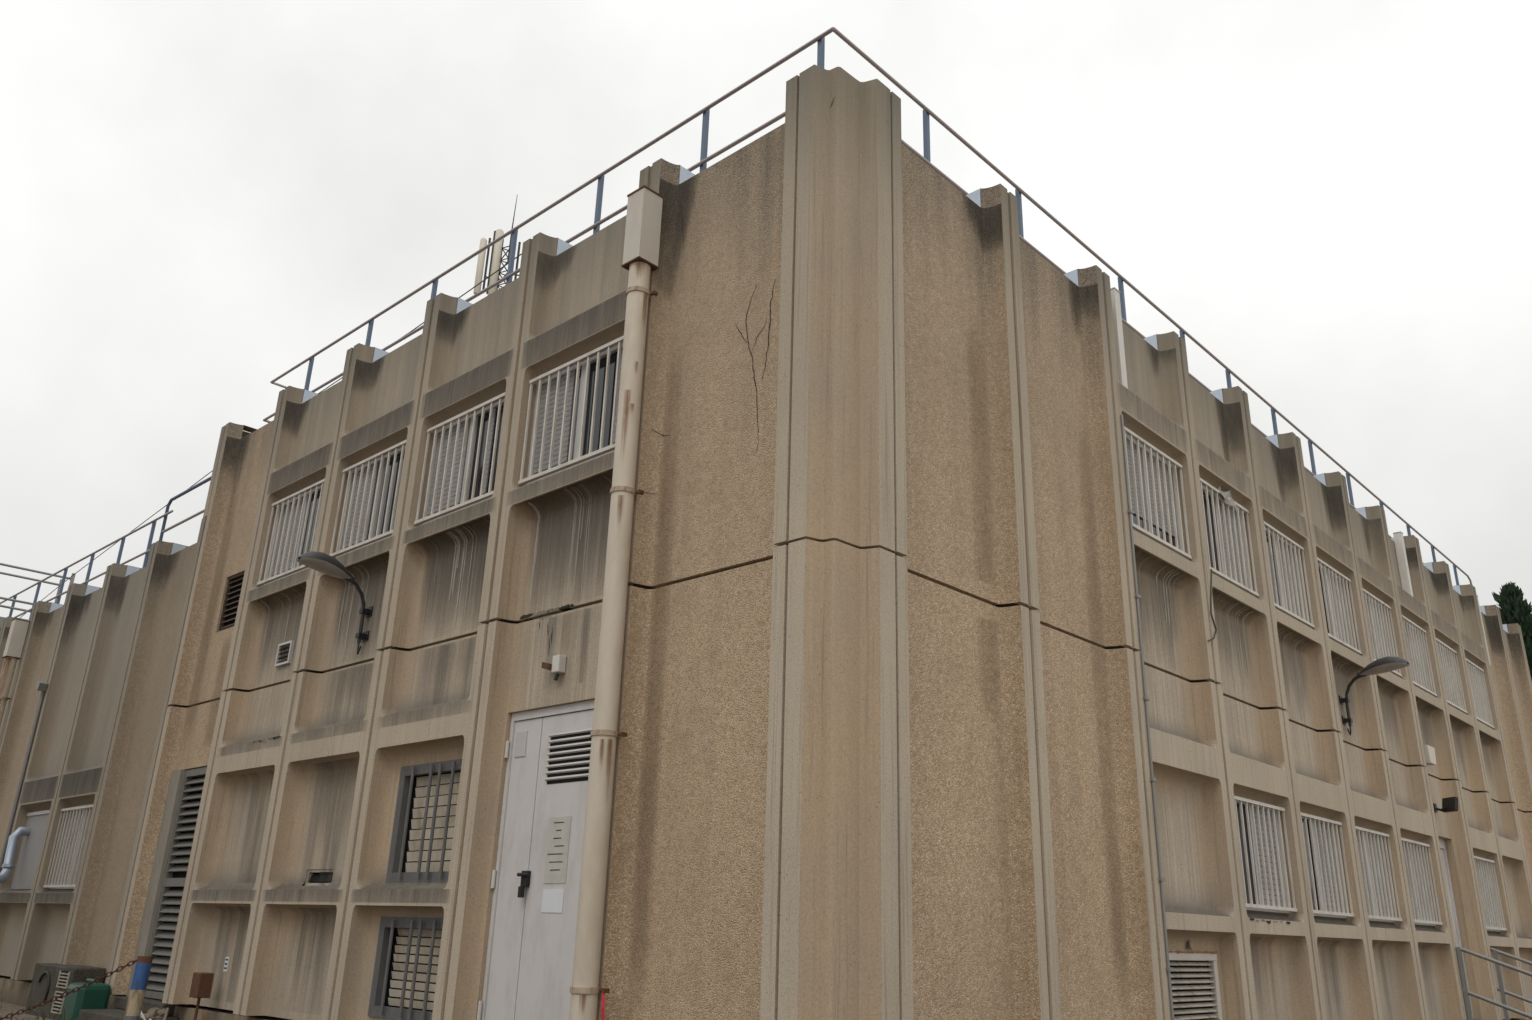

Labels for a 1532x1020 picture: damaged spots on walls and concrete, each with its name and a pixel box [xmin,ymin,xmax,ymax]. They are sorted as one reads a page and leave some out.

crack [736,282,775,452]
damp [1218,399,1243,447]